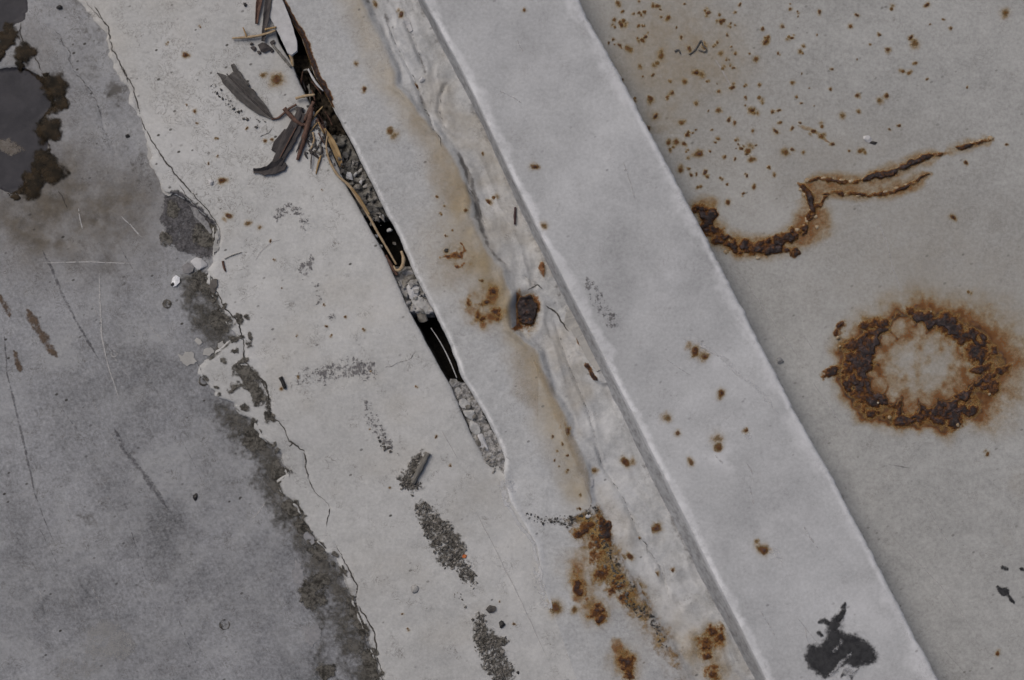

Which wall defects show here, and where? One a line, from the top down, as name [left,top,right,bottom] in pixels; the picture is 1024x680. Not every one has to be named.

spalling [0,0,70,201]
crack [89,6,221,243]
crack [283,0,334,107]
spalling [171,257,207,287]
peeling [190,206,220,252]
crack [368,221,411,267]
corrosion [666,120,1009,260]
peeling [178,338,224,366]
crack [385,317,464,383]
corrosion [821,296,1024,436]
corrosion [550,493,679,667]
corrosion [612,639,636,680]